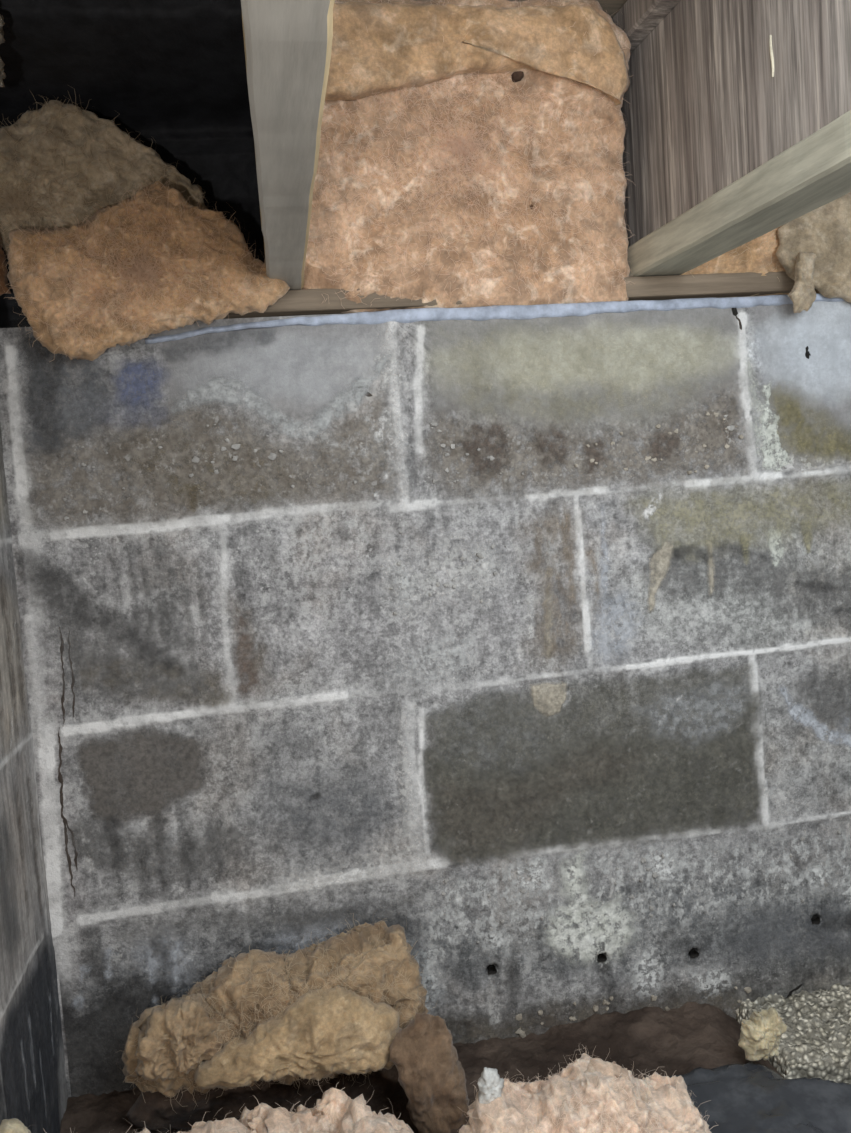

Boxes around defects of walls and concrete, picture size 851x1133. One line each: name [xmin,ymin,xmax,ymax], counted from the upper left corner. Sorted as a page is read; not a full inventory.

leakage [21,337,160,449]
leakage [174,351,401,437]
leakage [375,410,408,447]
leakage [759,385,851,471]
leakage [643,489,851,623]
leakage [74,731,241,878]
leakage [418,666,851,1010]